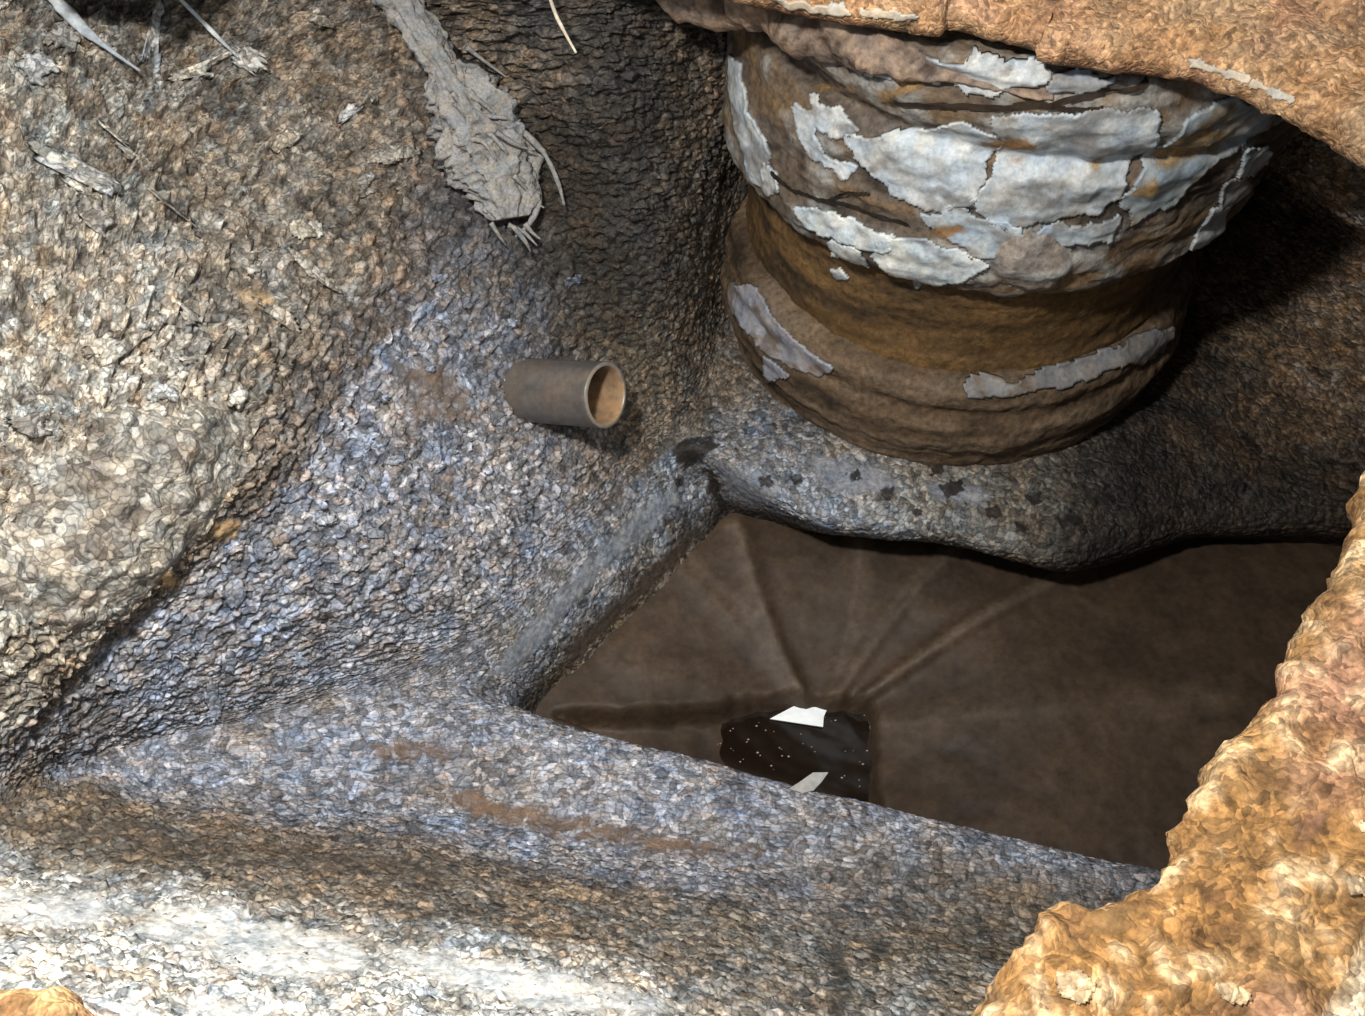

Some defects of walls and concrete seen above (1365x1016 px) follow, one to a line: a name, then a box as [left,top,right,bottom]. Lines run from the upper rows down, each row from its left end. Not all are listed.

peeling [774,0,919,21]
peeling [727,54,780,197]
peeling [790,45,1296,289]
rust [934,226,963,237]
peeling [726,281,834,383]
peeling [962,325,1175,400]